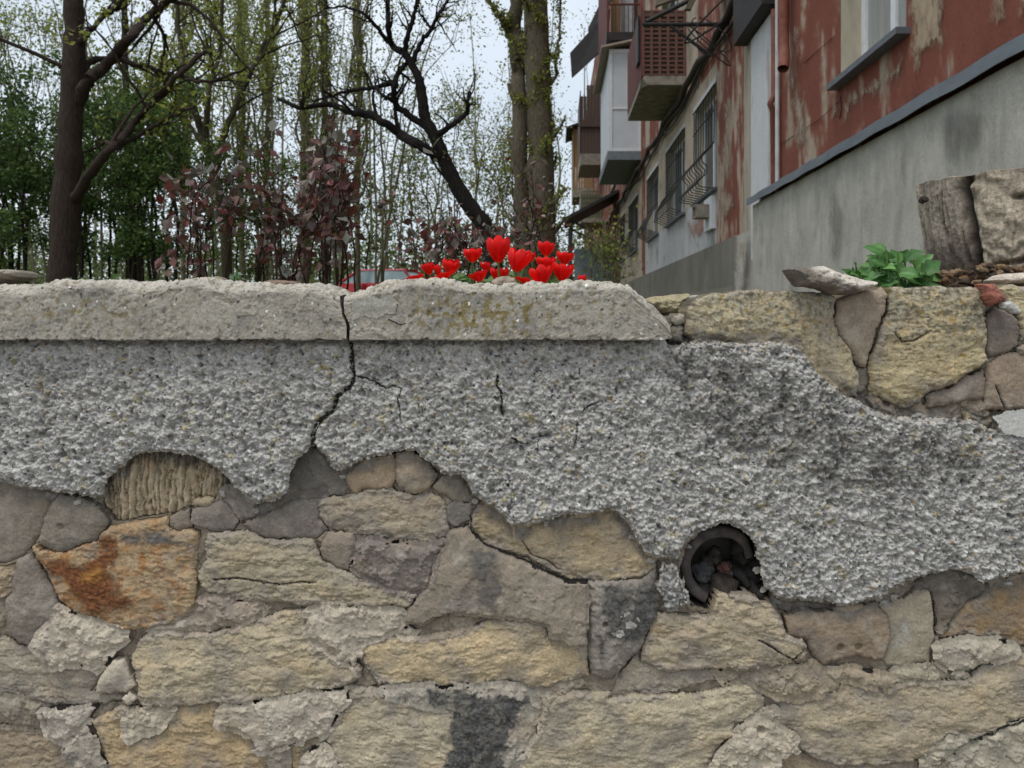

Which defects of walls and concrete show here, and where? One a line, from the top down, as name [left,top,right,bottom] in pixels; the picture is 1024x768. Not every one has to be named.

peeling [909,0,943,66]
crack [310,295,402,449]
crack [496,375,545,452]
spalling [668,329,1022,438]
spalling [0,443,1024,621]
rust [47,536,131,617]
water stain [427,686,530,768]